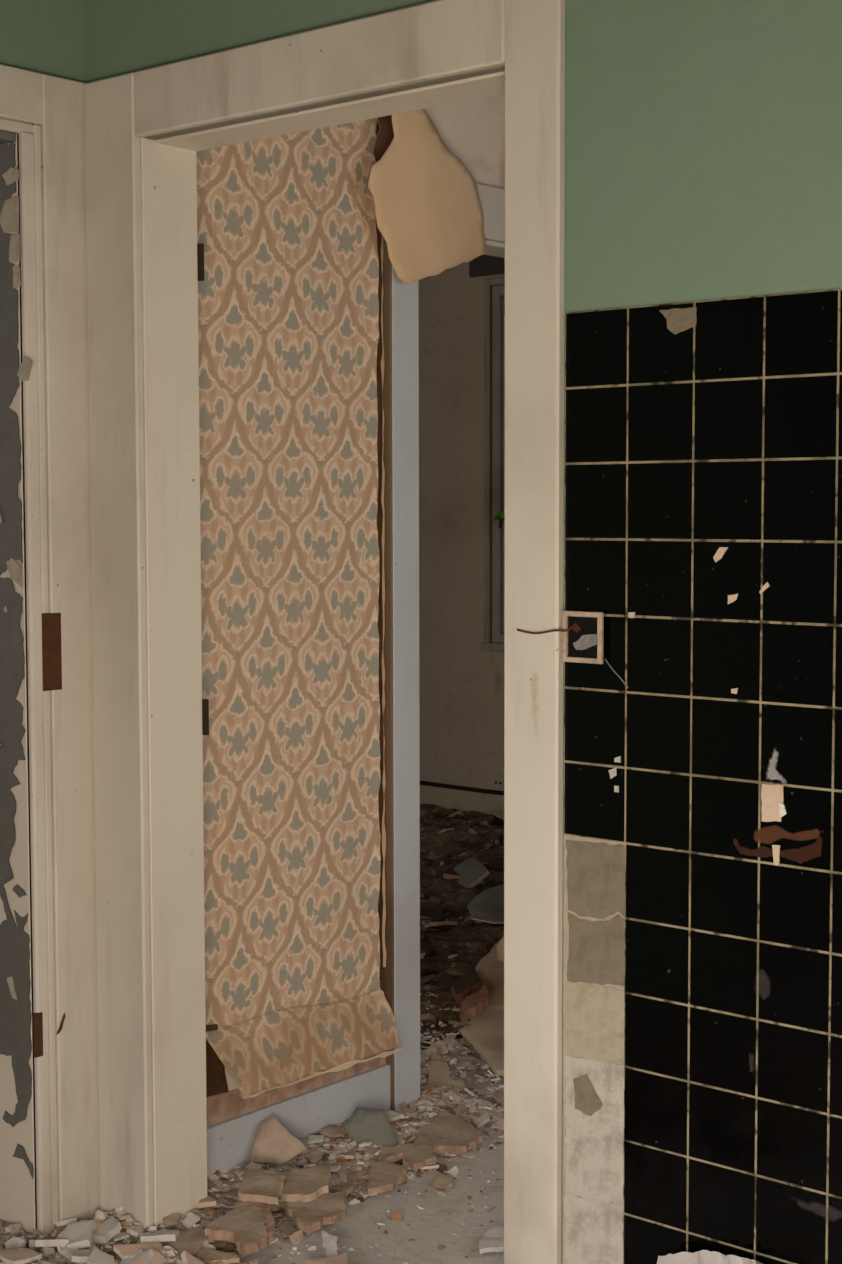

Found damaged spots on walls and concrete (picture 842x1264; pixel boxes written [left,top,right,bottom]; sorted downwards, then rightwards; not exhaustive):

peeling [0,142,33,1127]
peeling [12,1144,34,1179]